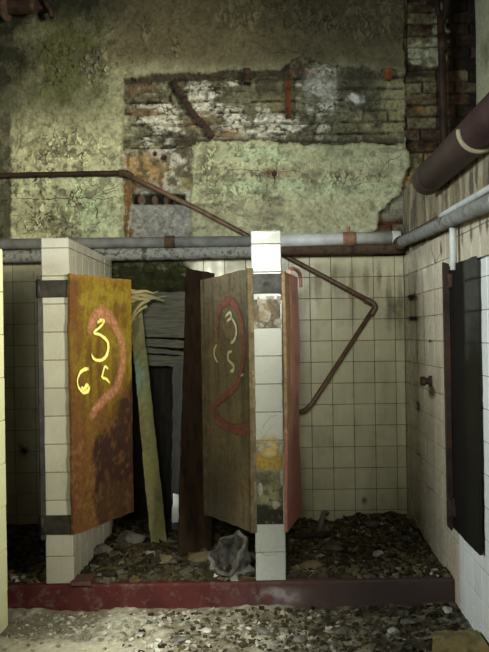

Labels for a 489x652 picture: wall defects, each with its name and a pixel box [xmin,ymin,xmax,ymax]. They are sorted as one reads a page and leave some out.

rust [124,180,136,237]
spalling [122,0,476,237]